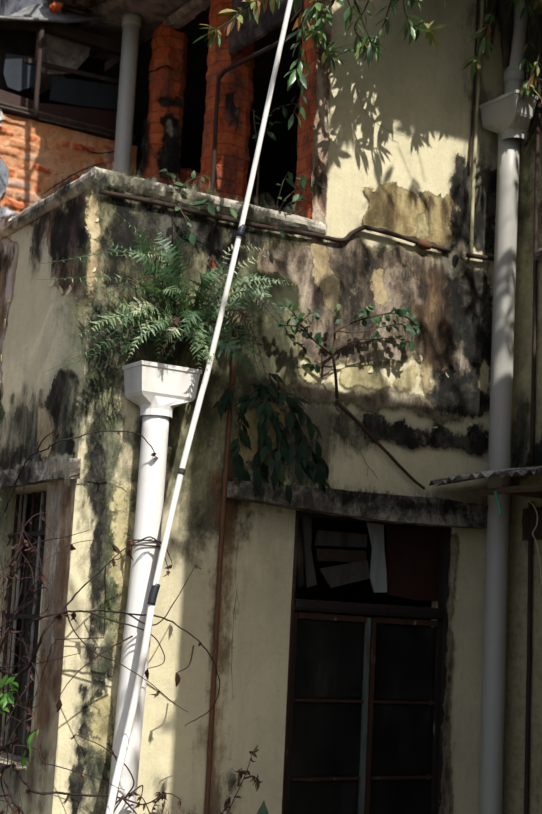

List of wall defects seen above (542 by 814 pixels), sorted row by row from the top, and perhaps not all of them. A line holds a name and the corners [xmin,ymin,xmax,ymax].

corrosion [35,479,74,728]
damp [0,92,275,814]
peeling [256,181,472,423]
damp [242,138,497,505]
damp [324,486,489,519]
damp [511,395,542,479]